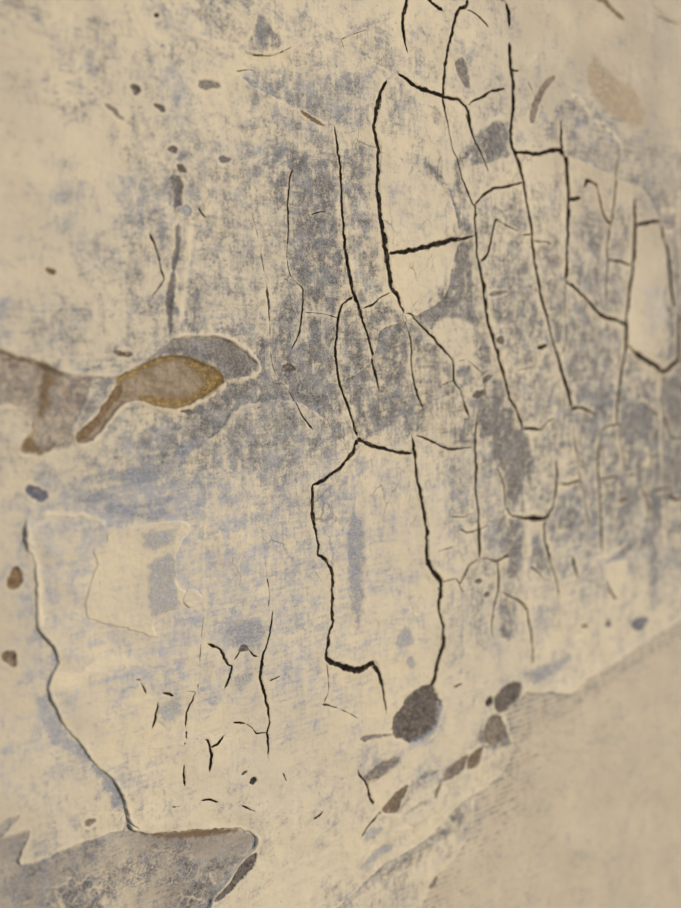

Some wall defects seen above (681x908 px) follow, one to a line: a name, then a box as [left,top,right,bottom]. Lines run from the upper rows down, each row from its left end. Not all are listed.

crack [252,214,270,323]
peeling [0,354,90,453]
crack [270,0,681,718]
spalling [631,617,648,632]
crack [136,562,280,808]
peeling [0,817,254,908]